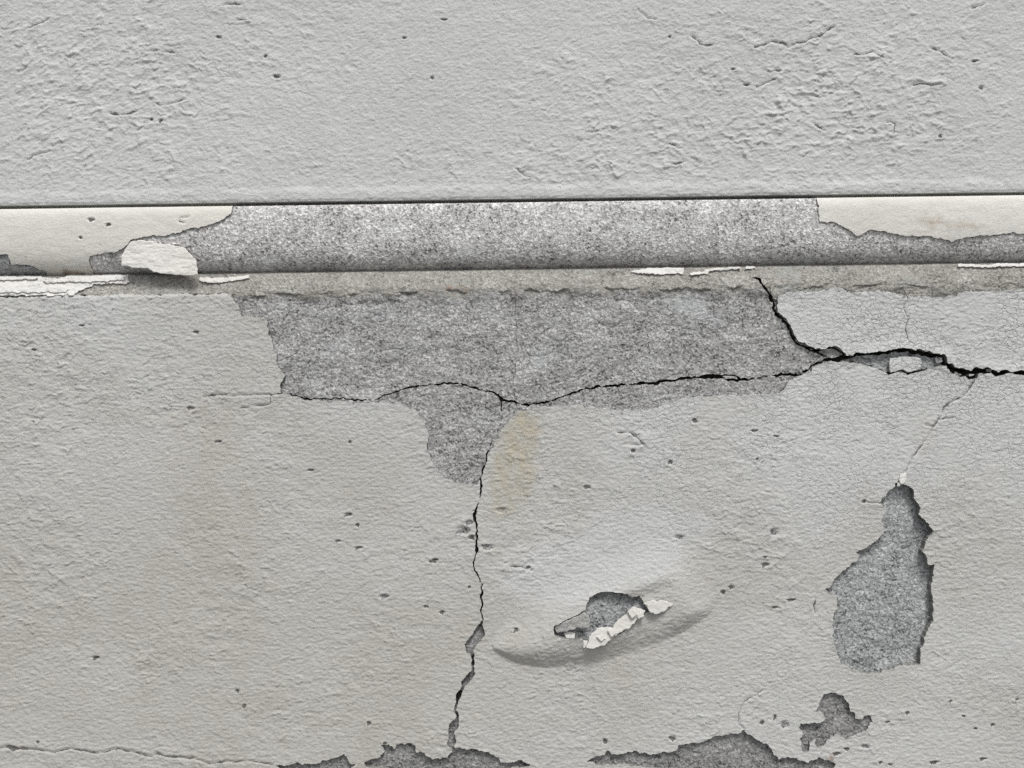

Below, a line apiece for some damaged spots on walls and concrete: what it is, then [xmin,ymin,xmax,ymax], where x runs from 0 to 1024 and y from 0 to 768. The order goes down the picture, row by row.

spalling [89,197,1024,485]
crack [205,277,1024,748]
spalling [826,473,934,673]
spalling [276,742,530,768]
spalling [587,693,890,768]